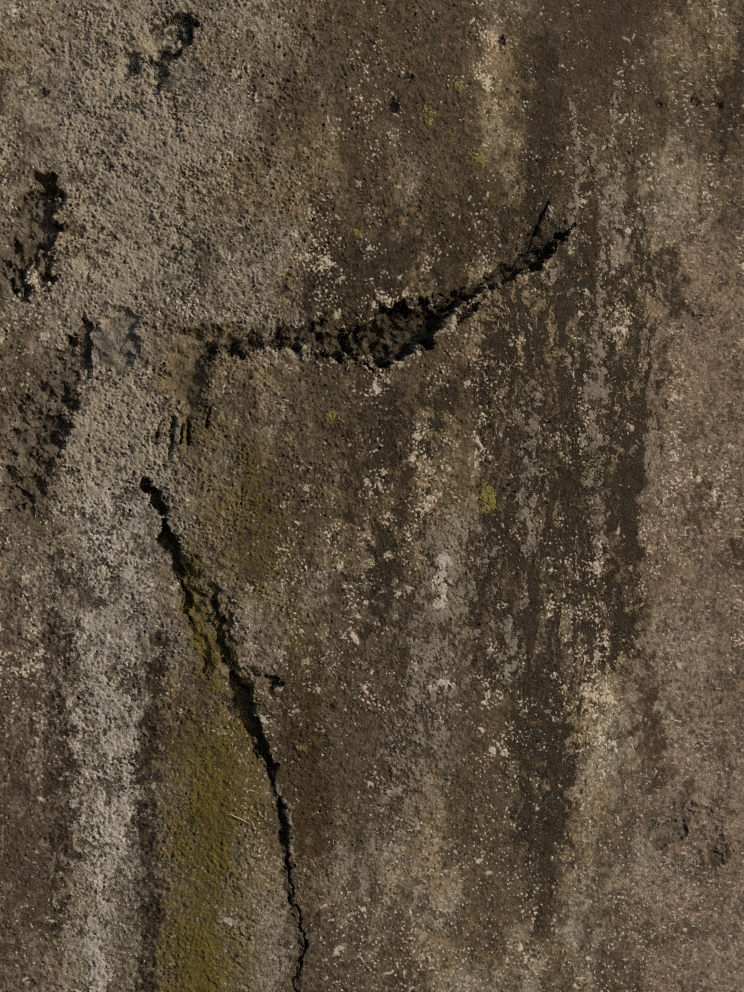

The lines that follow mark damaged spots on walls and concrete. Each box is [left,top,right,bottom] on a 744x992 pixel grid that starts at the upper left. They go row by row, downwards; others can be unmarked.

spalling [0,170,67,304]
crack [200,201,577,383]
damp [182,537,225,674]
crack [139,479,309,992]